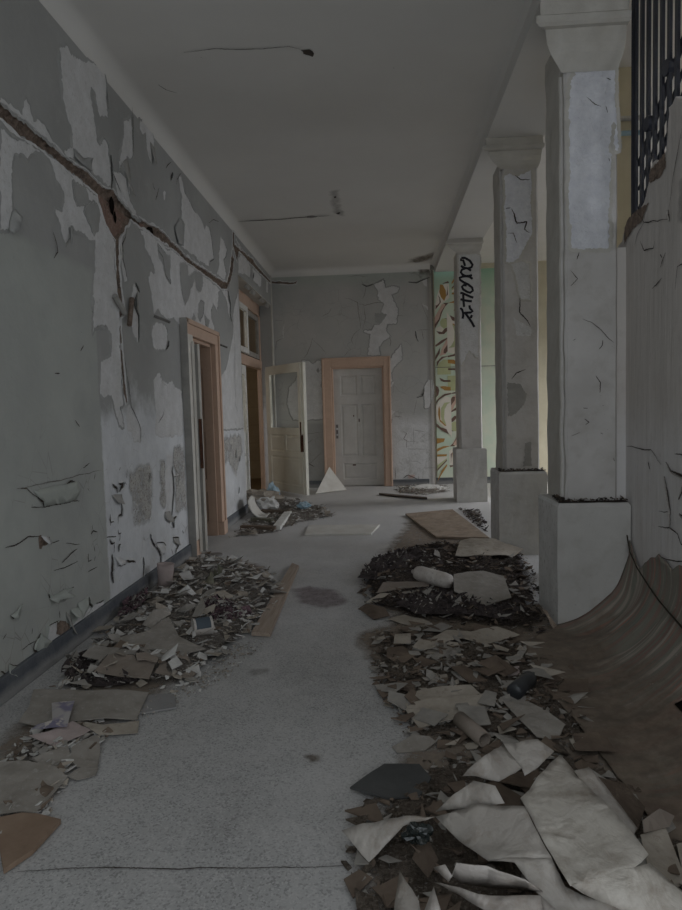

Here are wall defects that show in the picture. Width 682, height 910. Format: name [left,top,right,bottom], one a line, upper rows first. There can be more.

peeling [0,42,314,472]
peeling [363,278,403,387]
peeling [457,252,482,368]
peeling [502,168,535,265]
peeling [564,68,648,253]
spalling [648,153,666,183]
peeling [416,379,434,409]
spalling [5,535,57,549]
peeling [107,373,186,583]
crack [614,446,682,562]
peeling [24,596,105,652]